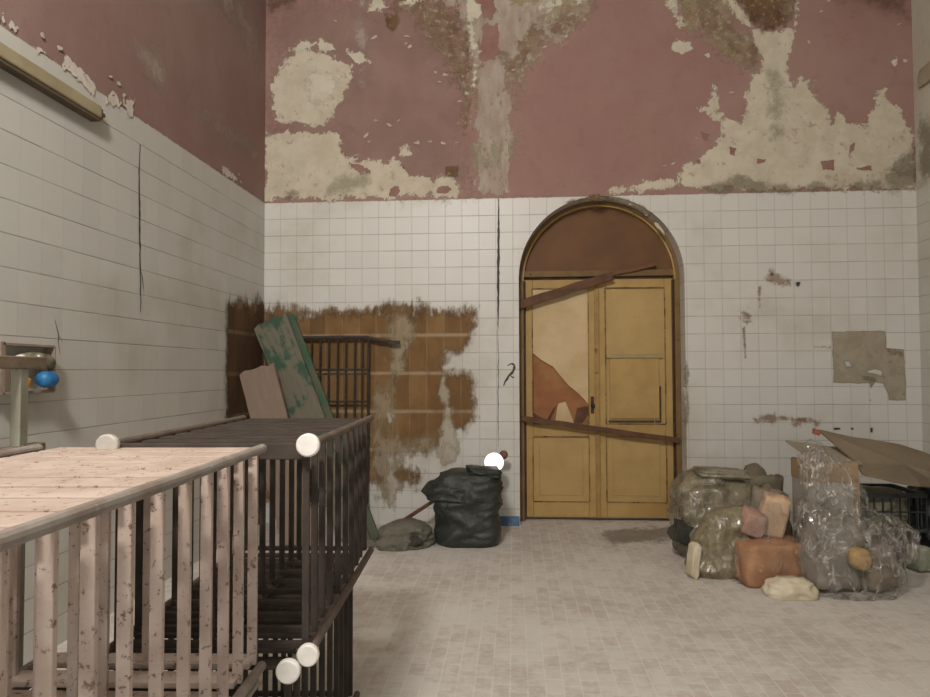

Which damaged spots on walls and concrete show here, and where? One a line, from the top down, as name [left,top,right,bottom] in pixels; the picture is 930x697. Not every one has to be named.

peeling [57,45,135,117]
peeling [265,38,461,203]
leakage [386,0,483,136]
peeling [360,0,575,198]
leakage [496,0,596,97]
peeling [567,0,916,205]
crack [137,145,145,312]
peeling [226,293,477,506]
crack [494,199,502,446]
peeling [832,331,906,400]
peeling [258,460,270,525]